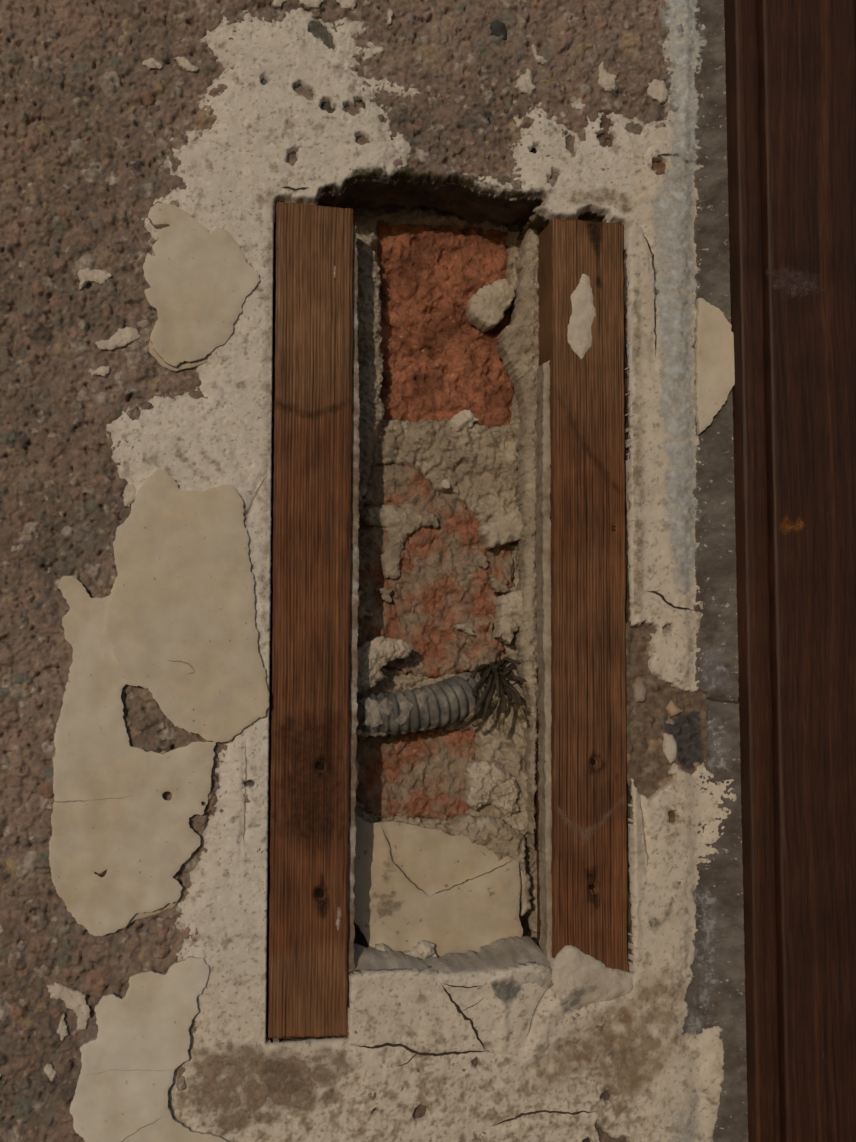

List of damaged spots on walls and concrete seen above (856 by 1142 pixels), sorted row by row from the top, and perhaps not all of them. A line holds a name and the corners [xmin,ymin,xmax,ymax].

crack [648,591,691,610]
spalling [626,621,708,799]
crack [380,825,511,897]
crack [355,984,494,1066]
crack [526,981,551,1038]
crack [490,1110,595,1127]